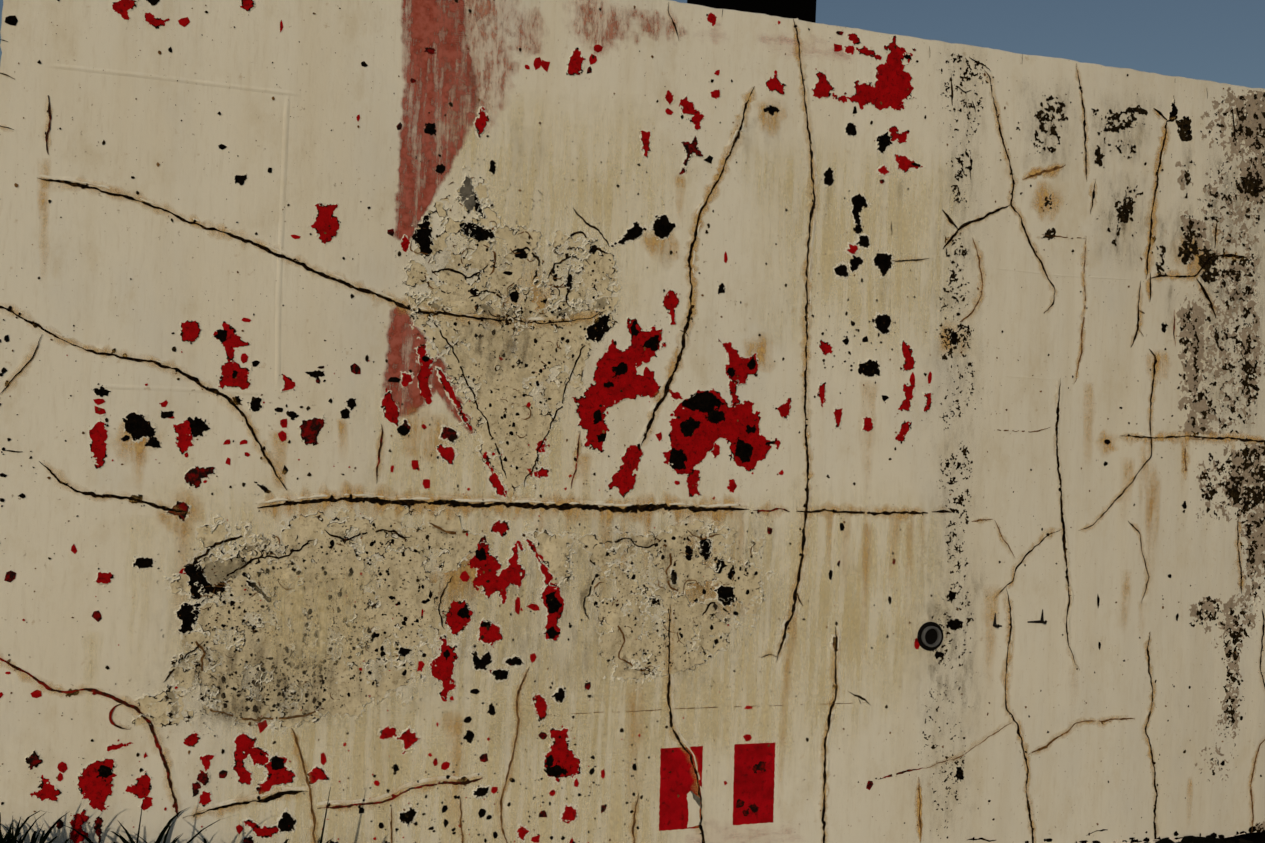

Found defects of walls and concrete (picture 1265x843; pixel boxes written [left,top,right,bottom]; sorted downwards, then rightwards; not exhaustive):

peeling [810,27,926,184]
leakage [1033,95,1072,154]
leakage [1082,105,1148,167]
crack [0,652,529,843]
peeling [176,316,356,449]
peeling [24,385,780,843]
crack [0,18,951,670]
peeling [379,156,795,505]
crack [775,626,870,843]
leakage [915,443,976,839]
crack [878,57,1265,843]
leakage [1151,91,1265,756]